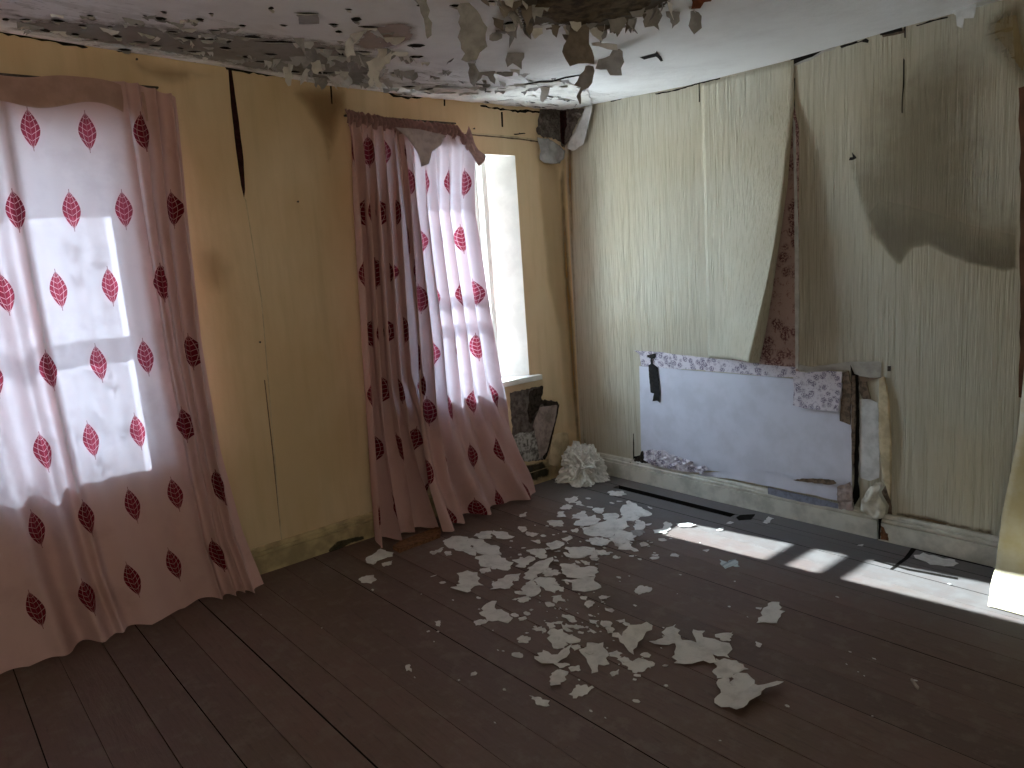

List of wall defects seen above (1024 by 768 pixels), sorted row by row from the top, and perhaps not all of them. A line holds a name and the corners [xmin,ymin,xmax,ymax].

crack [0,32,88,48]
crack [225,67,283,196]
peeling [2,0,711,164]
crack [389,93,445,106]
crack [480,105,539,127]
flaking render [510,386,569,466]
flaking render [837,377,892,511]